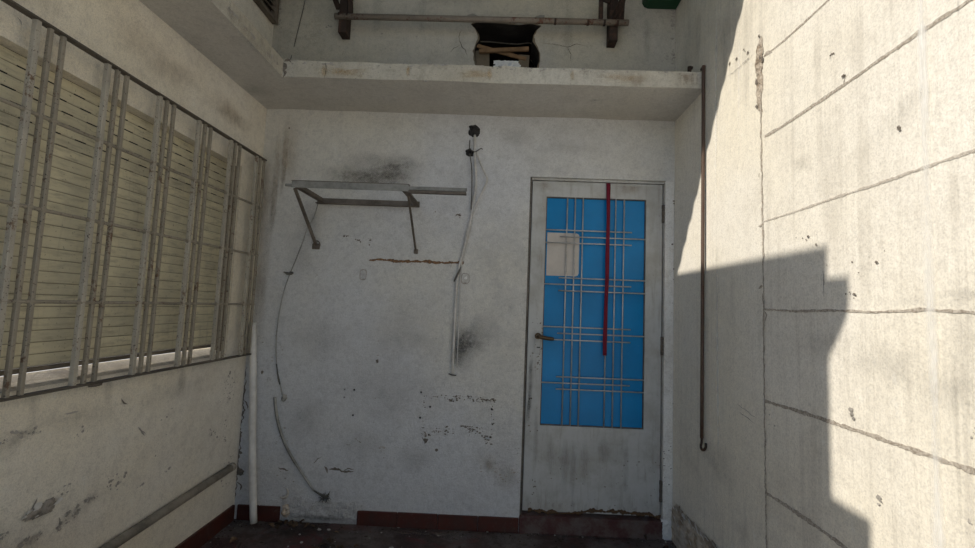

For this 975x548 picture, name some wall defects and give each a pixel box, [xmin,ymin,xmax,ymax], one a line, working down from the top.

spalling [467,14,545,68]
spalling [729,34,764,112]
peeling [421,395,496,452]
spalling [22,483,71,522]
corrosion [528,508,661,520]
spalling [671,504,717,548]